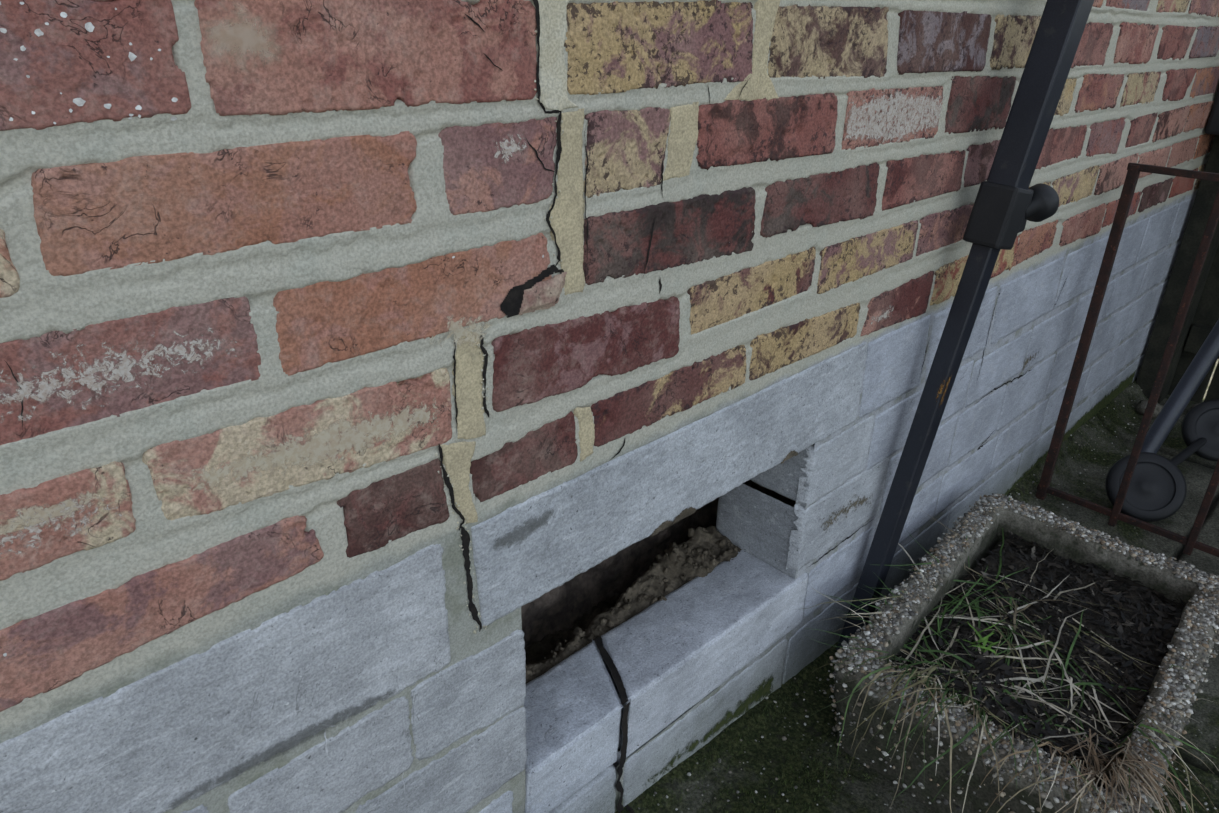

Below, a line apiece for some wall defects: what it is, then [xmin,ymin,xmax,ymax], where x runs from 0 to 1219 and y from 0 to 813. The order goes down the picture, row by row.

crack [464,13,503,71]
crack [526,0,589,272]
spalling [500,264,567,318]
leakage [0,328,237,420]
crack [435,330,492,634]
spalling [743,480,796,507]
spalling [521,497,719,648]
crack [595,636,635,813]